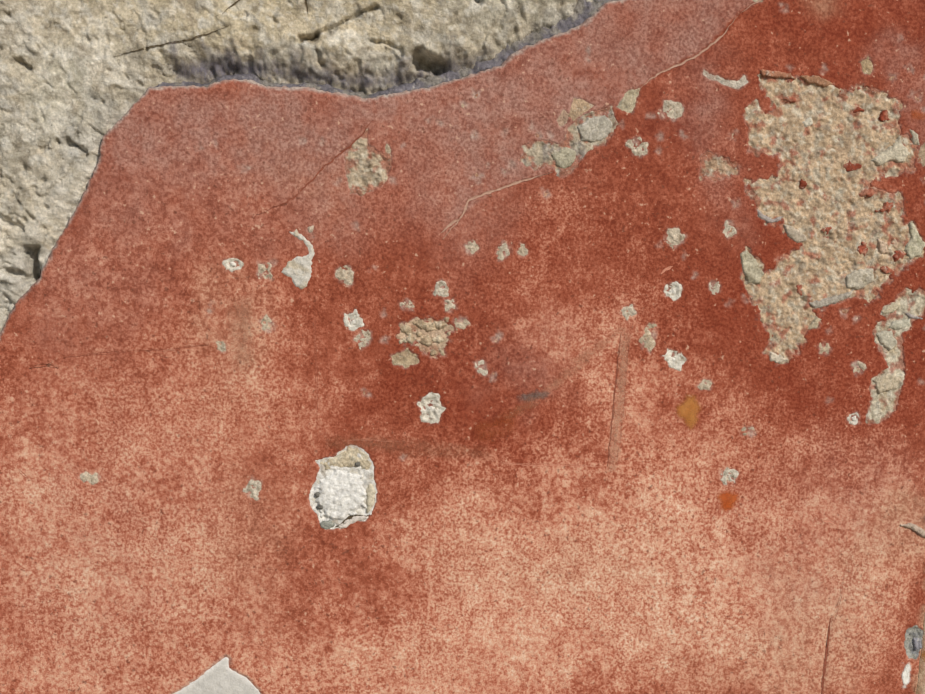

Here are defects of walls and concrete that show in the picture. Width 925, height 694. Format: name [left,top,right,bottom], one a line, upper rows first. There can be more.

crack [113,0,239,57]
crack [637,0,762,92]
flaking render [258,225,315,289]
crack [256,117,376,218]
spalling [335,265,354,285]
crack [441,172,552,239]
spalling [519,88,640,178]
spalling [698,56,925,425]
spalling [344,309,371,350]
spalling [391,280,470,368]
spalling [417,392,446,424]
spalling [309,445,377,530]